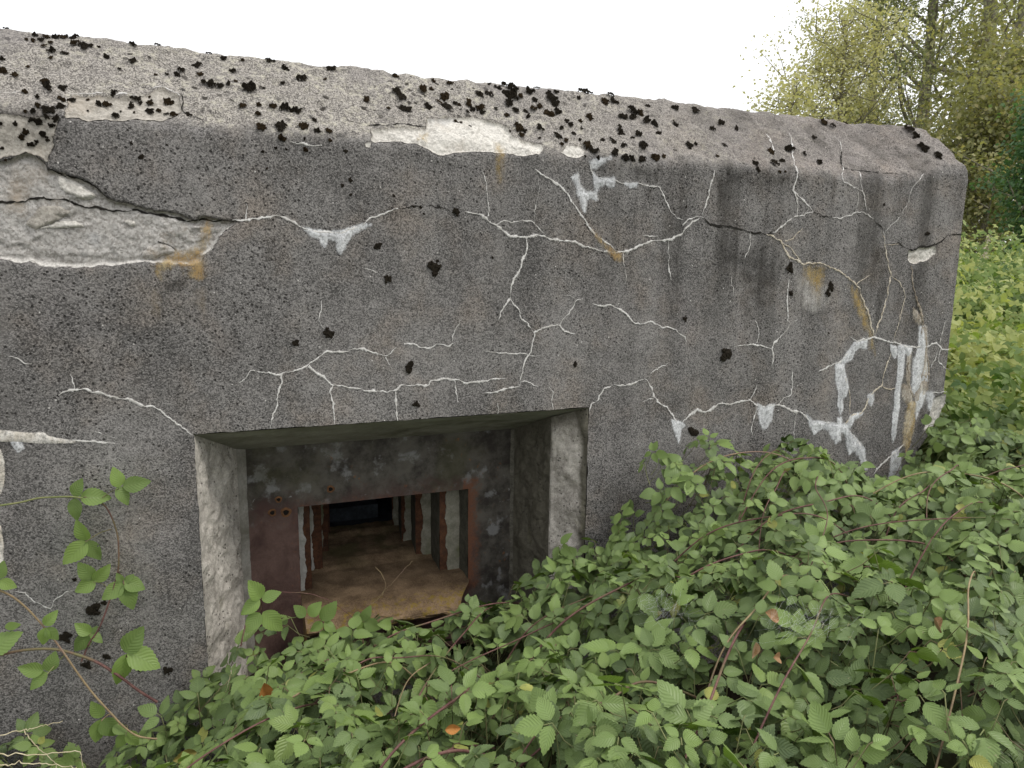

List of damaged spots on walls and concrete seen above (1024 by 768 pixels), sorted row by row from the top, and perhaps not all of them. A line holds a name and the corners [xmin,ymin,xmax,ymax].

spalling [0,88,236,268]
spalling [365,117,543,156]
spalling [561,145,585,158]
damp [571,156,638,212]
damp [305,223,371,254]
spalling [907,246,936,264]
crack [0,134,963,475]
damp [806,340,874,470]
rust [903,400,916,452]
damp [888,309,935,479]